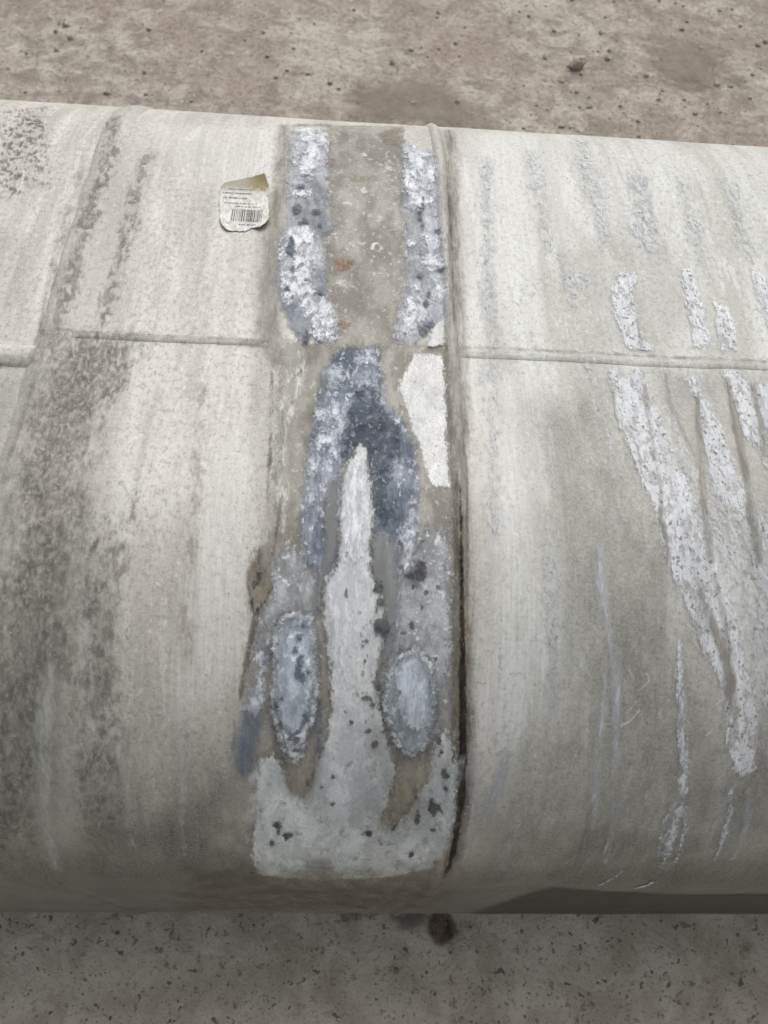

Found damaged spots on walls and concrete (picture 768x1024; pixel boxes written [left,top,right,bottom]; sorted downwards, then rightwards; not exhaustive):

damp [611,270,652,351]
damp [679,268,737,351]
peeling [275,348,307,532]
peeling [399,320,450,487]
peeling [247,443,458,880]
crack [443,479,474,878]
damp [658,640,690,864]
damp [592,366,768,776]
damp [714,790,749,860]